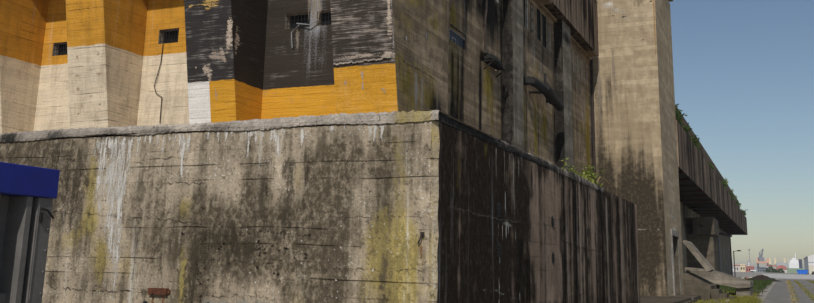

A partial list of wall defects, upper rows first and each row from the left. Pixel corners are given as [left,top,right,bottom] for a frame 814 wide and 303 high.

leakage [96,134,191,297]
leakage [188,224,260,303]
leakage [207,127,309,238]
leakage [561,182,639,303]